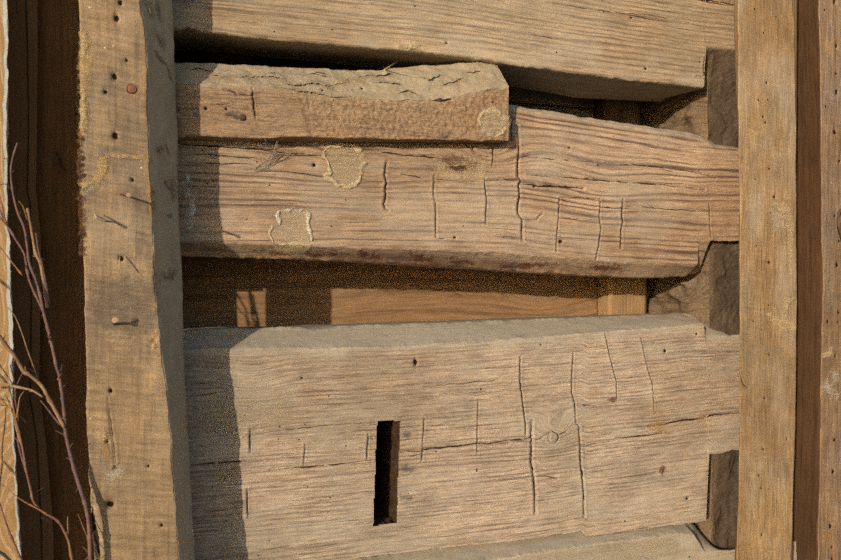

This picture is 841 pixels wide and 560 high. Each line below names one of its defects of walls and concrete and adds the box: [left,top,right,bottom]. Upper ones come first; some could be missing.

crack [352,120,716,251]
crack [400,377,737,513]